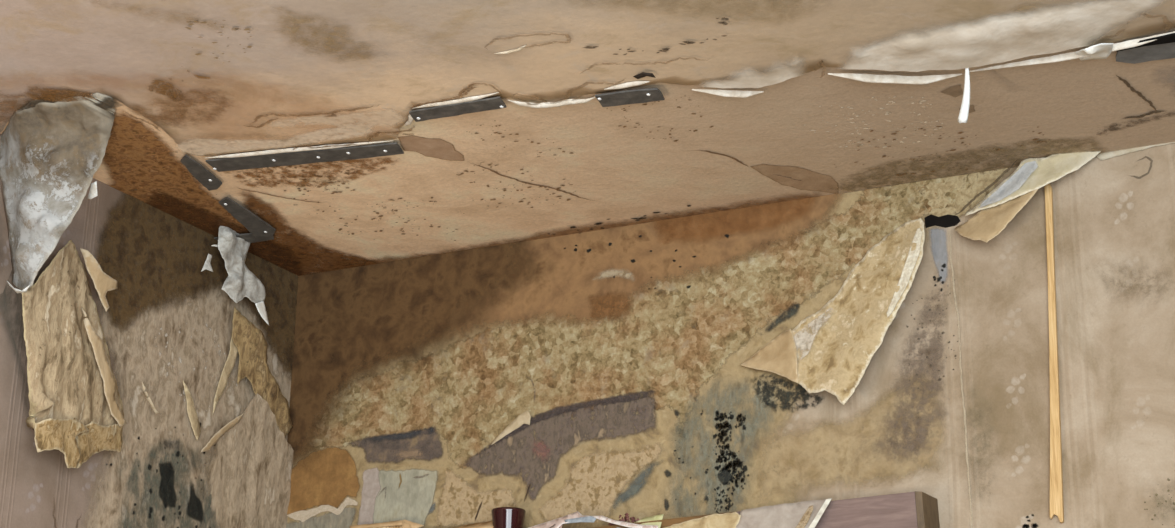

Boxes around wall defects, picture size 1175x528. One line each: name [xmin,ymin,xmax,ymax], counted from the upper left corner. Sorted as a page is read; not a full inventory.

leakage [0,87,122,121]
leakage [136,71,227,123]
crack [1116,75,1164,119]
crack [477,165,589,200]
leakage [97,193,228,330]
peeling [286,164,1008,528]
leakage [244,126,1099,465]
leakage [106,427,218,528]
leakage [616,375,822,516]